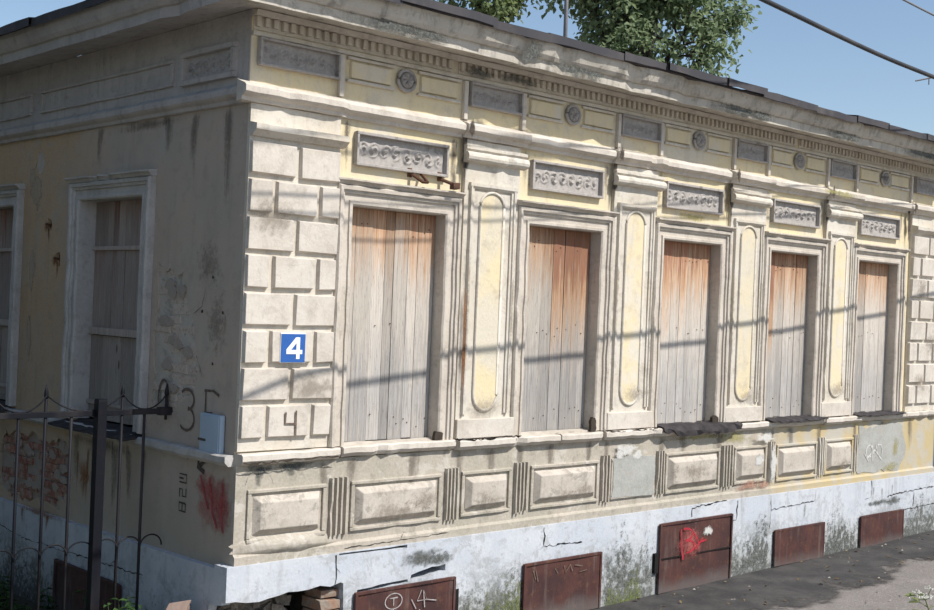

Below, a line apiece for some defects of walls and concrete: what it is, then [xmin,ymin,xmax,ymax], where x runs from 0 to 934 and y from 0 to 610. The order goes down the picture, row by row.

spalling [153,261,201,425]
spalling [0,427,74,511]
peeling [615,445,642,459]
crack [335,532,449,584]
leakage [605,545,653,606]